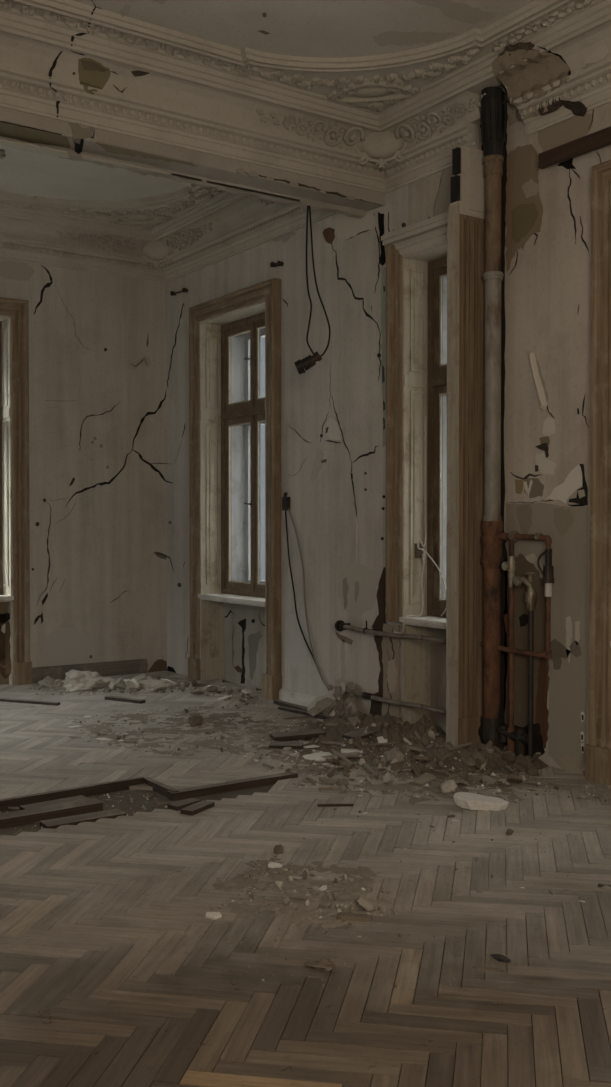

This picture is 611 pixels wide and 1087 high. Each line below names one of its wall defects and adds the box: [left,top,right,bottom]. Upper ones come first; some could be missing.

crack [0,0,103,135]
spalling [78,58,110,95]
spalling [491,42,587,125]
crack [567,109,601,252]
crack [34,265,91,350]
crack [34,303,185,625]
crack [288,374,378,558]
flaking render [369,567,401,719]
peeling [505,417,588,769]